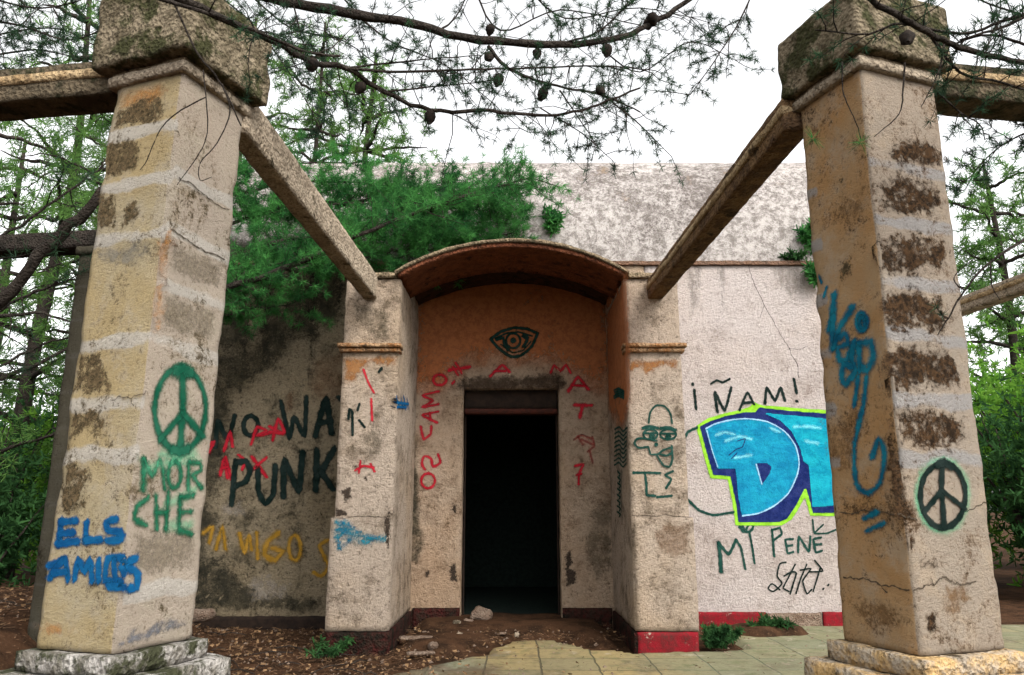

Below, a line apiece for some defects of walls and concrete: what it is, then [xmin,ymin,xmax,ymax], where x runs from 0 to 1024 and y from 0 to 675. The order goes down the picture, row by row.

water stain [230,234,317,267]
crack [748,265,805,377]
water stain [195,265,344,612]
crack [843,576,976,593]